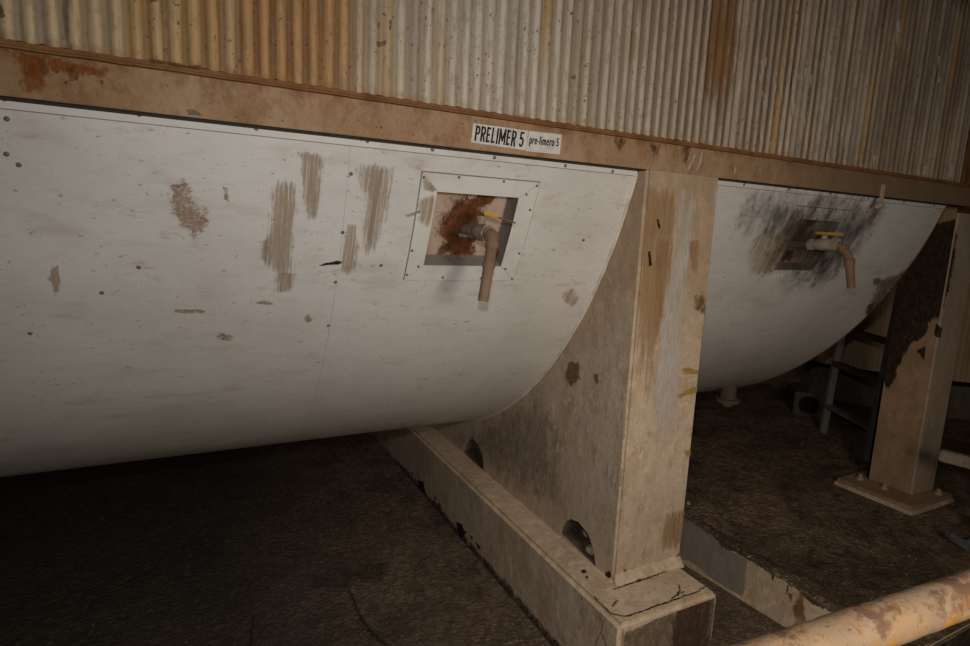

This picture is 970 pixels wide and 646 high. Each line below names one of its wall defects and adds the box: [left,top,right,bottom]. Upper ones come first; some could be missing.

corrosion [0,38,970,188]
corrosion [437,195,497,255]
crack [594,554,706,646]
corrosion [789,591,805,621]